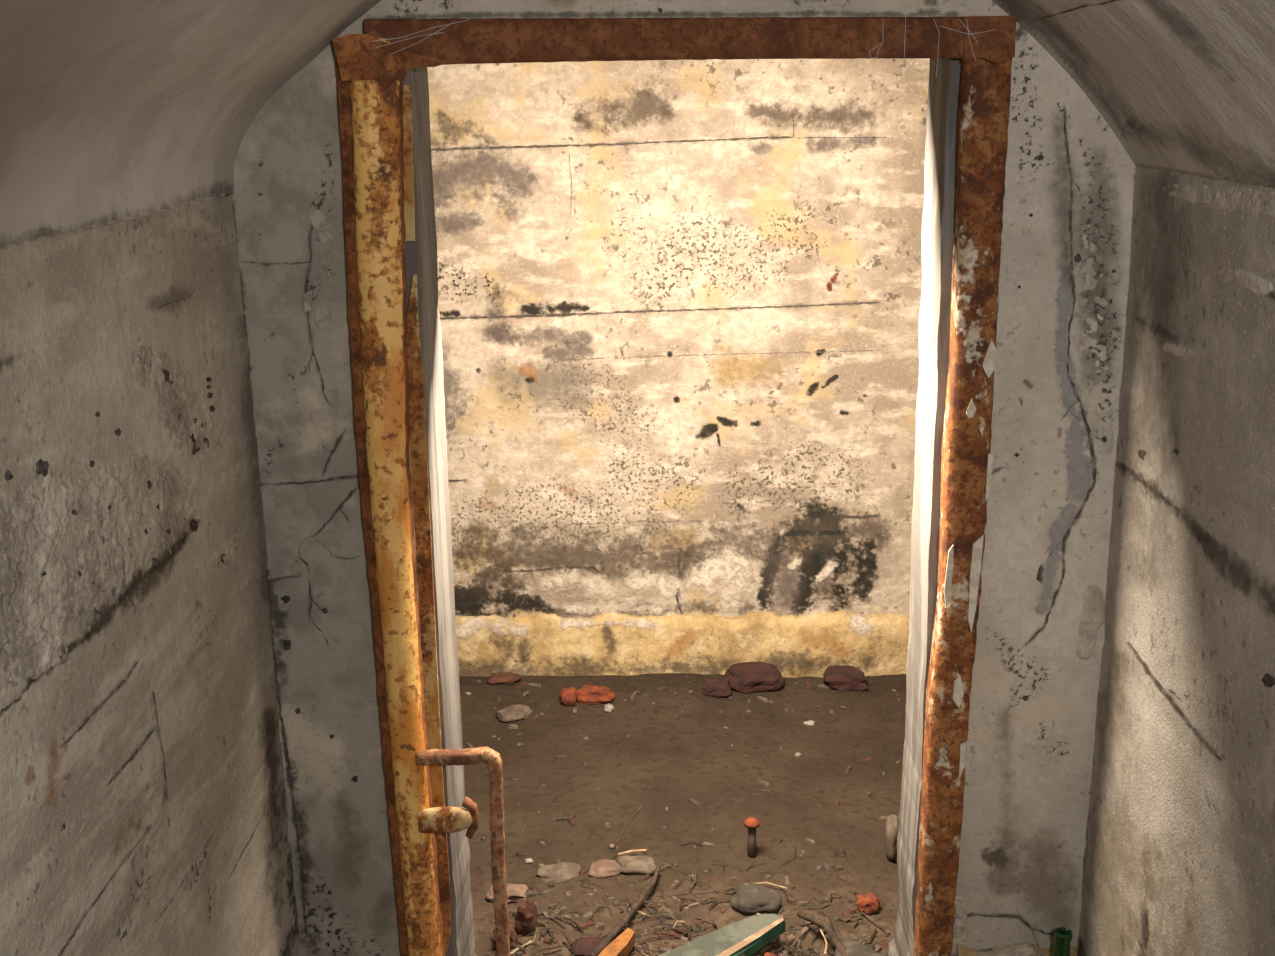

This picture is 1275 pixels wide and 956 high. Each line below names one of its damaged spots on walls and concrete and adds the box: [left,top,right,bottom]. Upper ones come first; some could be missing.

crack [1037,0,1117,20]
damp [438,112,469,135]
damp [575,90,672,129]
damp [749,105,874,150]
damp [432,140,535,232]
damp [632,205,818,304]
damp [438,264,651,439]
damp [696,417,760,446]
damp [807,375,838,396]
crack [1030,110,1178,641]
crack [226,193,360,932]
damp [452,446,887,677]